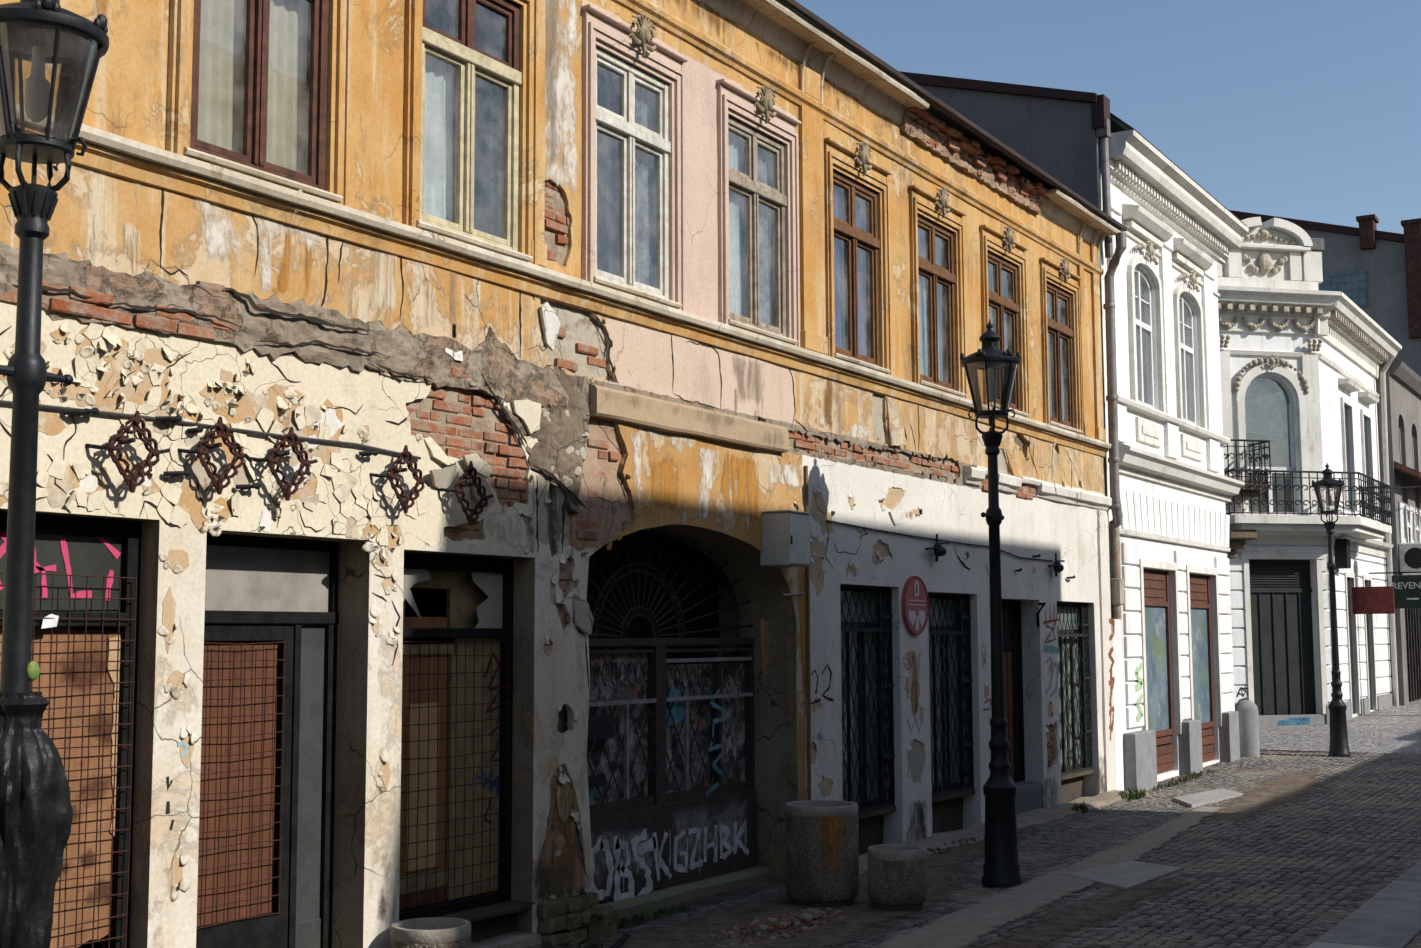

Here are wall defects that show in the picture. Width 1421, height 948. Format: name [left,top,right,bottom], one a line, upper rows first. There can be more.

spalling [899,106,1050,215]
spalling [544,180,570,267]
crack [16,189,432,383]
spalling [539,298,616,383]
crack [0,386,11,437]
crack [37,374,77,494]
crack [328,405,408,425]
spalling [788,389,959,483]
crack [139,479,203,527]
crack [277,503,324,532]
spalling [406,383,640,657]
peeling [790,485,893,598]